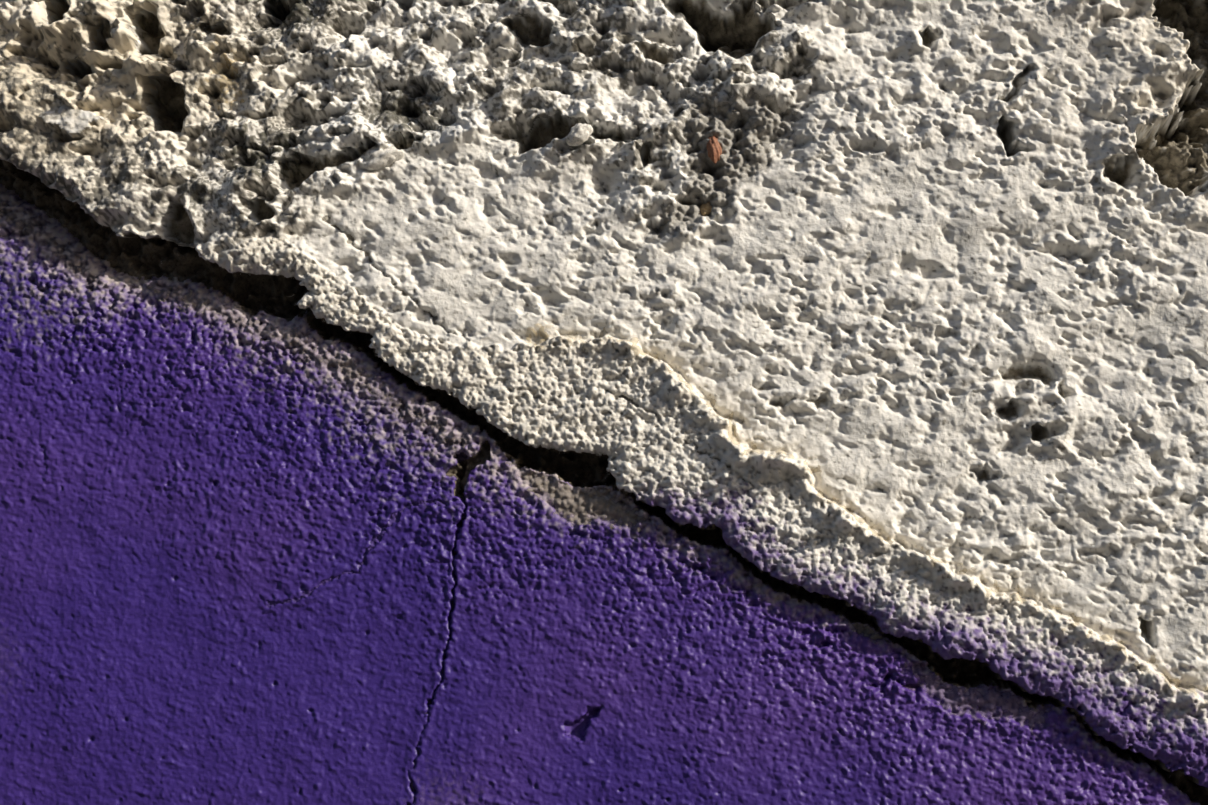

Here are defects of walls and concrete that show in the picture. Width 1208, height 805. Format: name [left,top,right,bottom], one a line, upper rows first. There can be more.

peeling [39,104,105,137]
spalling [645,90,798,240]
spalling [1135,0,1208,196]
peeling [0,197,96,292]
crack [322,216,464,336]
crack [606,390,657,416]
crack [446,440,491,502]
crack [267,500,448,608]